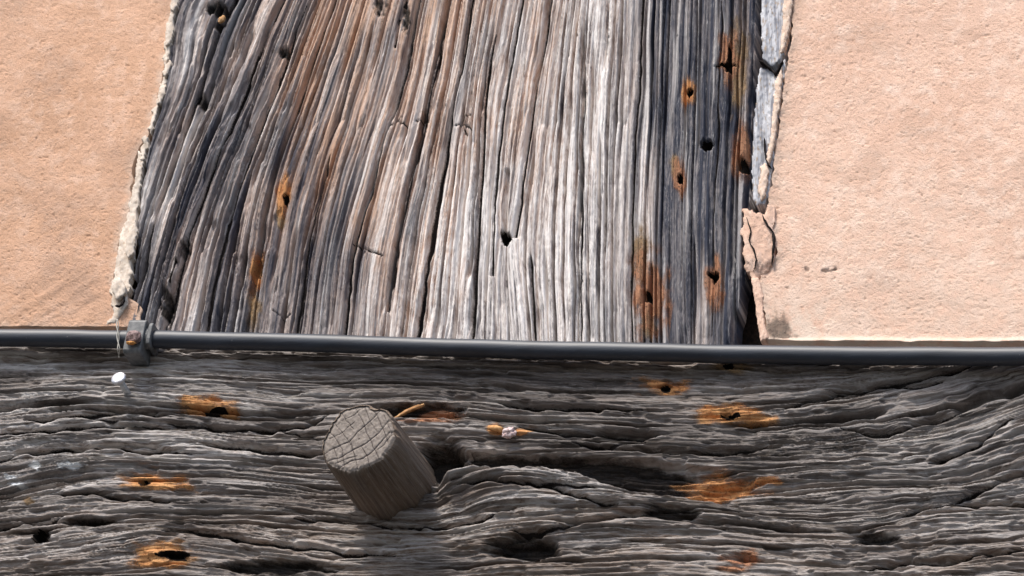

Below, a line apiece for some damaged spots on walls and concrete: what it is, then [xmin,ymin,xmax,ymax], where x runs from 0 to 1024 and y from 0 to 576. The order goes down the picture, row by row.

rust [681,79,695,109]
flaking render [740,0,794,280]
flaking render [106,0,180,325]
rust [671,155,687,199]
rust [633,227,672,339]
rust [704,255,724,311]
rust [181,395,239,421]
rust [400,410,458,422]
rust [697,404,778,429]
rust [120,473,193,490]
rust [672,472,783,504]
rust [134,540,196,569]